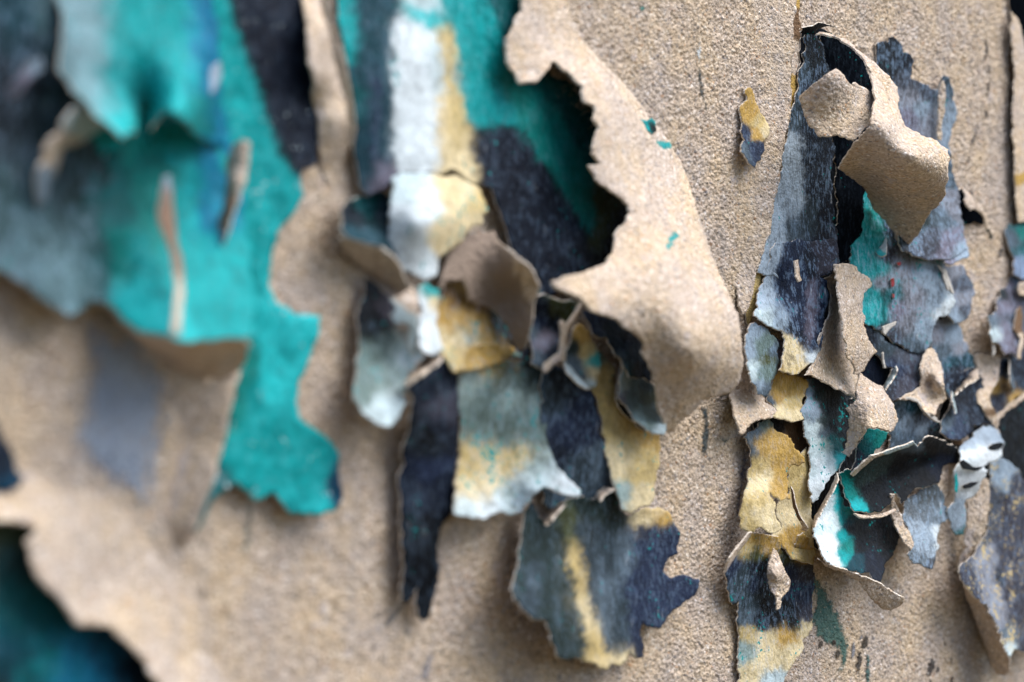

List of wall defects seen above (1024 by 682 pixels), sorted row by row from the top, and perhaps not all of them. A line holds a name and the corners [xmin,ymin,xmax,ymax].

peeling [0,0,700,682]
peeling [504,0,1024,682]